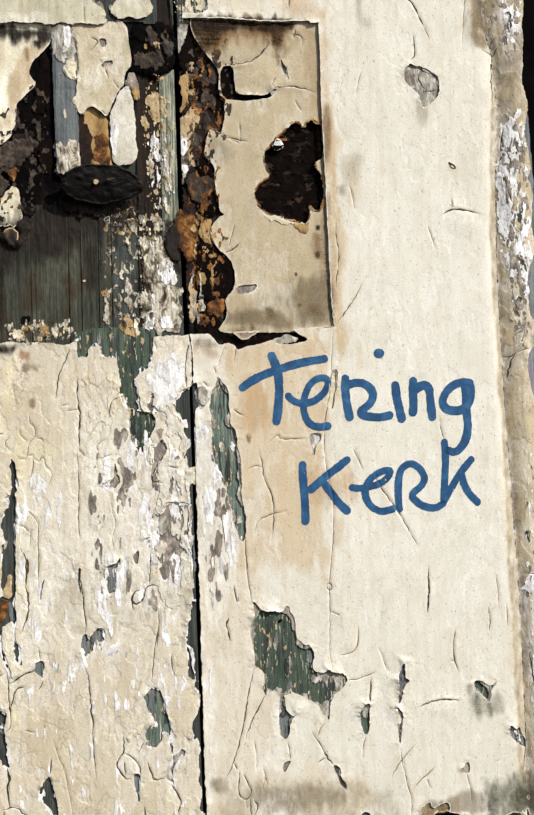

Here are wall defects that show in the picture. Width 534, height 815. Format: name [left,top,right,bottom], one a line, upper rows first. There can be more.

rust [79,107,112,165]
rust [163,22,237,334]
peeling [403,64,439,107]
peeling [493,108,534,395]
crack [56,349,117,544]
peeling [0,62,309,792]
crack [19,512,45,631]
crack [1,768,26,815]
crack [0,653,43,733]
peeling [33,765,68,815]
crack [224,668,268,815]
peeling [251,602,347,739]